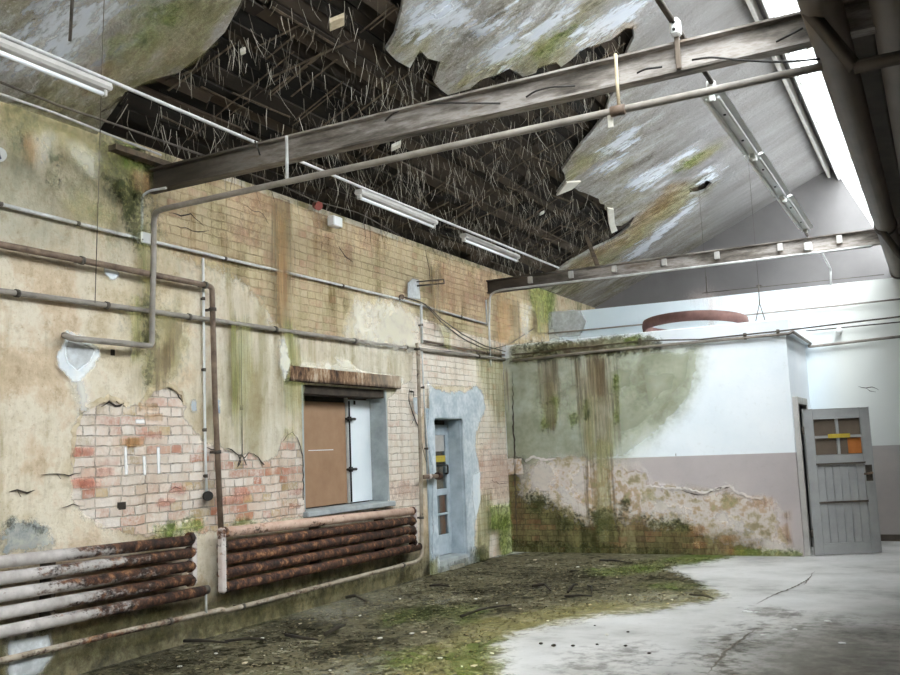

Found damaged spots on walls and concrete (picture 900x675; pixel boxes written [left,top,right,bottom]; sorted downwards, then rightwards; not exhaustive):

peeling [22,0,127,60]
peeling [406,0,470,41]
peeling [480,7,572,71]
peeling [569,1,647,45]
peeling [628,150,696,191]
water stain [100,140,174,388]
flaking render [151,180,788,560]
water stain [503,311,694,540]
crack [10,473,78,497]
spalling [70,381,305,538]
crack [762,571,815,601]
crack [708,629,762,673]